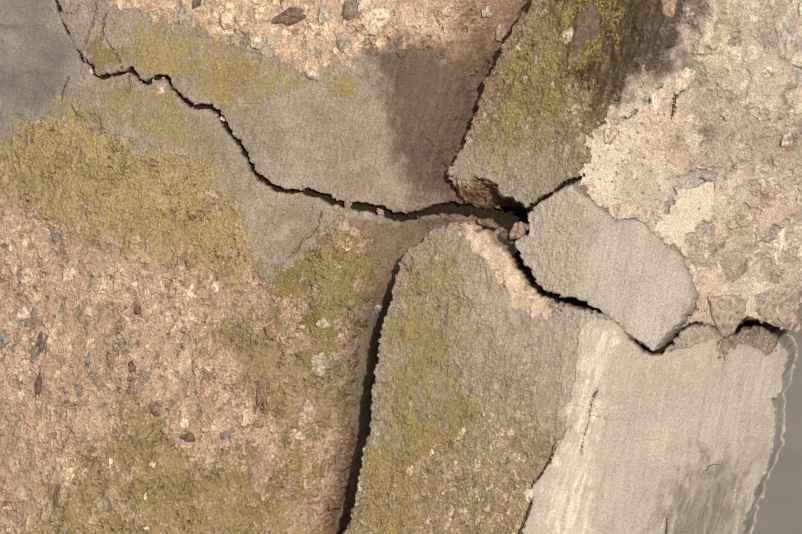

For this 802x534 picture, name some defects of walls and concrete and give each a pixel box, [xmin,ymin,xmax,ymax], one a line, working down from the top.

crack [55,0,589,306]
crack [660,86,678,119]
crack [518,340,629,534]
spalling [521,0,802,534]
crack [635,323,726,361]